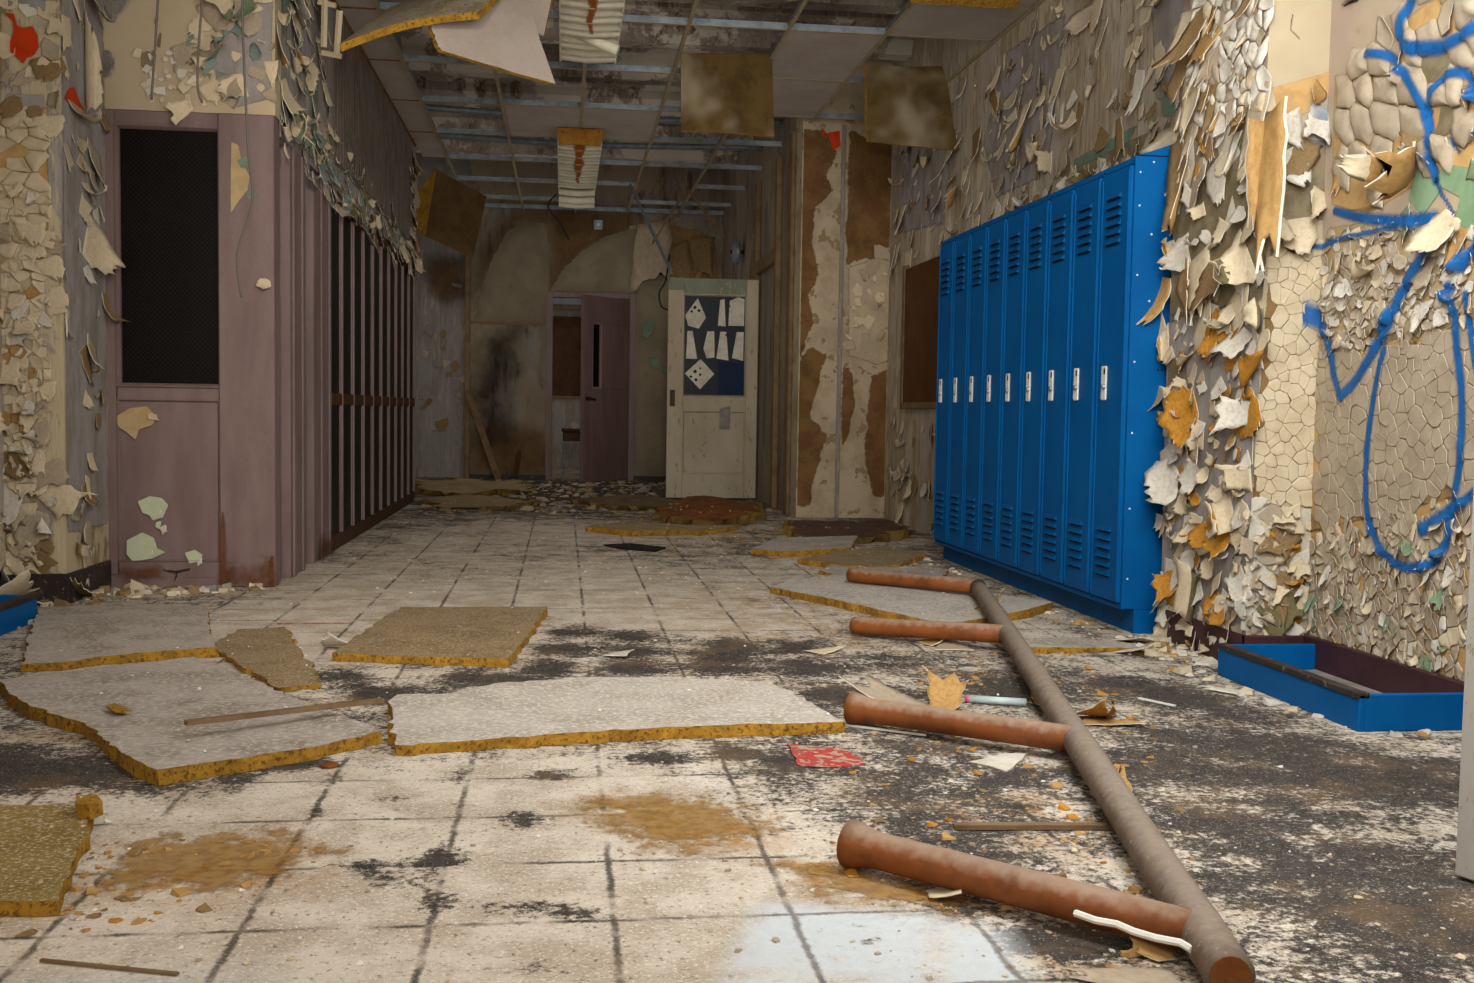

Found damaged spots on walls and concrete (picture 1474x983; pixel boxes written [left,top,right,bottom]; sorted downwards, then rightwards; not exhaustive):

peeling [0,0,431,604]
spalling [820,131,841,150]
peeling [842,0,1474,672]
crack [1185,0,1300,129]
crack [1252,0,1474,680]